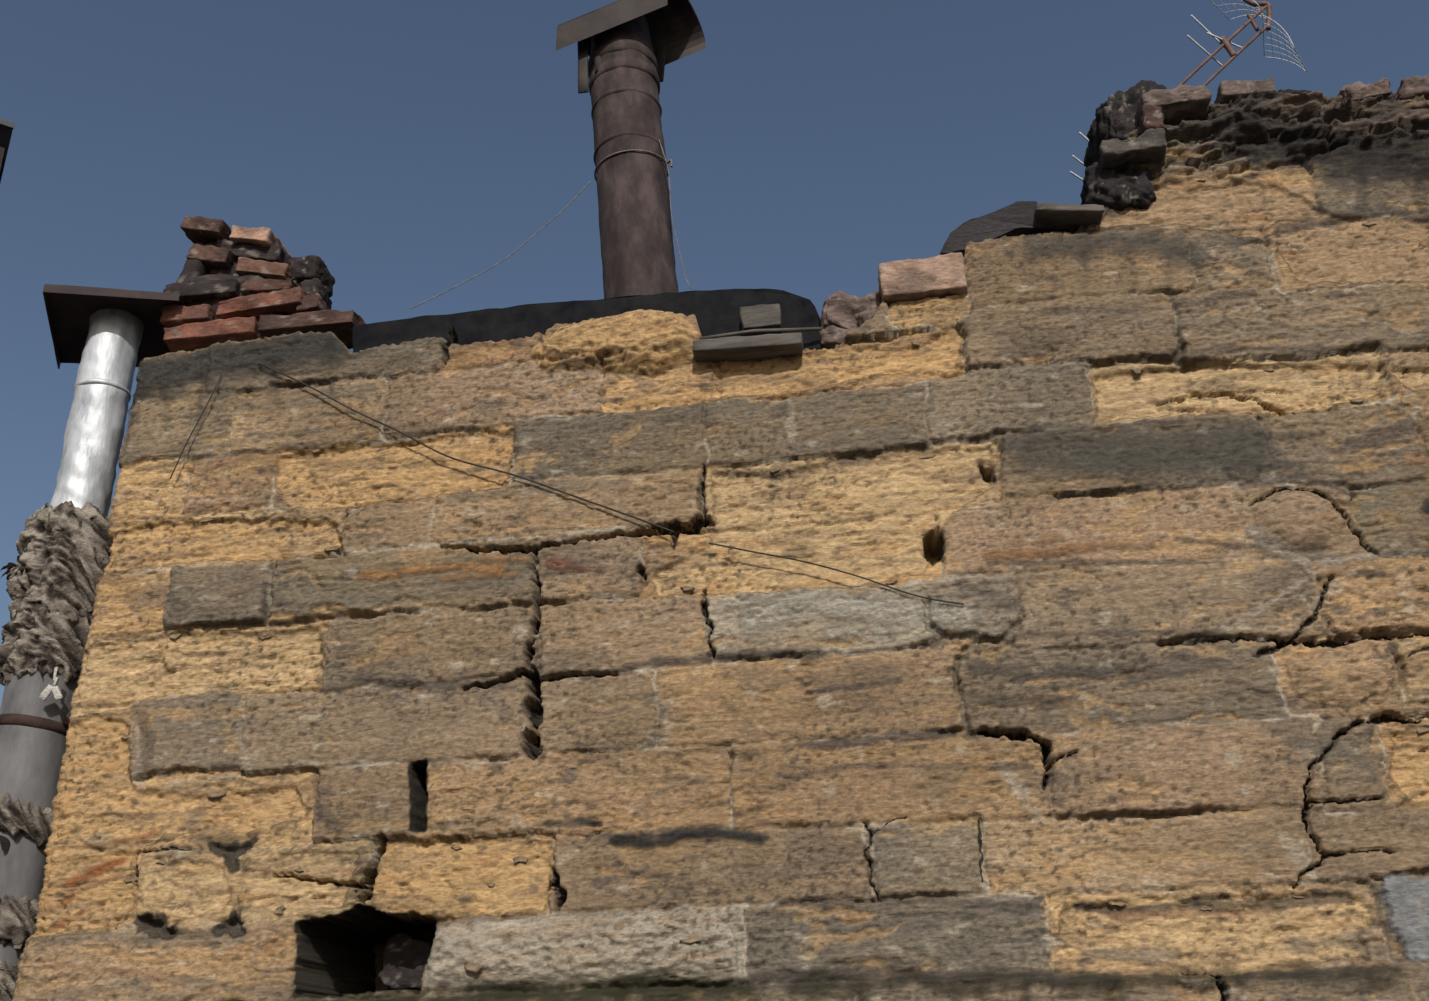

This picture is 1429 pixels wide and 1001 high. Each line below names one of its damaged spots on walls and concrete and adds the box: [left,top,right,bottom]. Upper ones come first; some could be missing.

crack [1251,488,1374,555]
crack [458,466,711,760]
crack [701,595,716,659]
crack [1158,580,1429,658]
crack [977,730,1077,790]
crack [1292,714,1425,889]
crack [287,848,386,901]
crack [863,817,907,900]
crack [977,820,985,882]